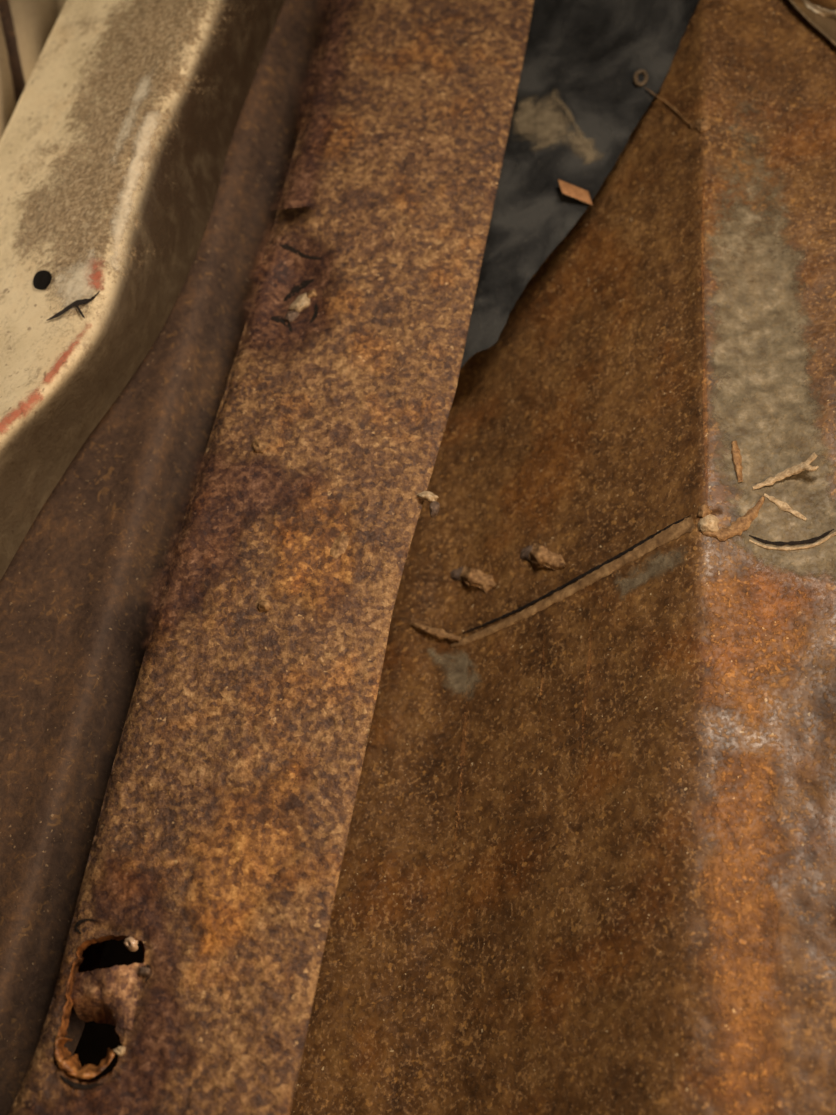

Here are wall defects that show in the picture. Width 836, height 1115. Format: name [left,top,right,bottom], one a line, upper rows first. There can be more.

corrosion [9,0,534,1115]
corrosion [695,569,814,726]
corrosion [699,749,785,1115]